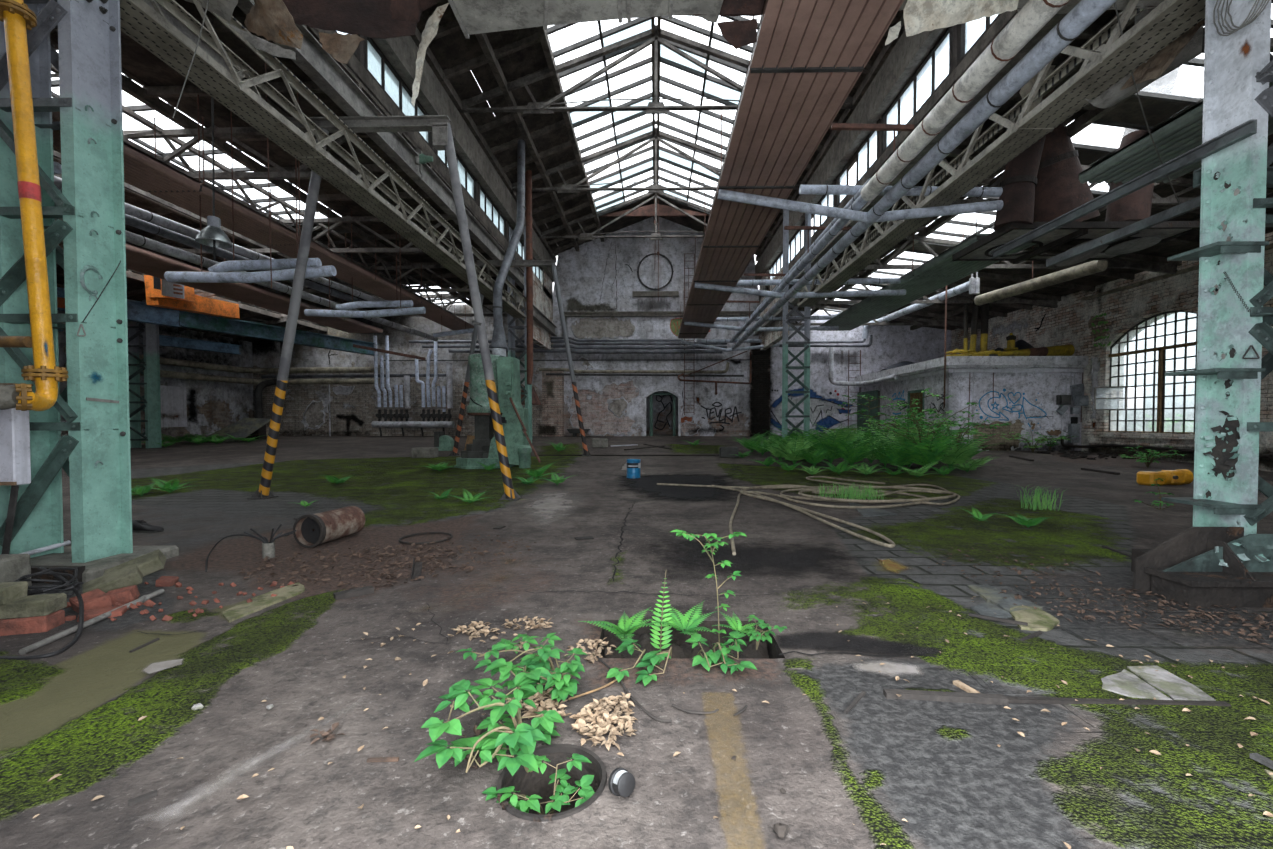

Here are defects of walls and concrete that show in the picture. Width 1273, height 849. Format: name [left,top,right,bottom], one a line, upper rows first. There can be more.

peeling [1203,379,1240,500]